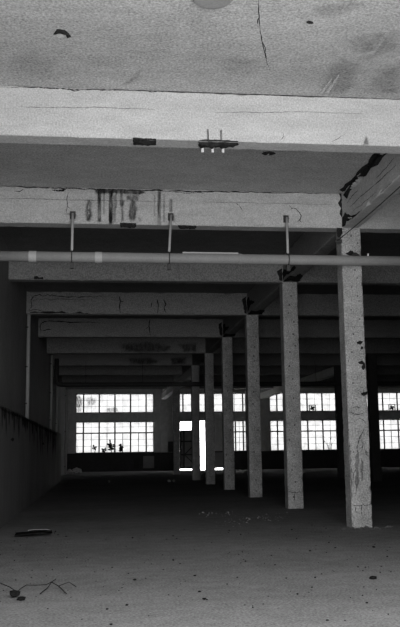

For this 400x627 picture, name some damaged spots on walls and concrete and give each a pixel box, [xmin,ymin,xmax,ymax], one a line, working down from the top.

spalling [53,29,71,39]
crack [257,0,269,67]
water stain [95,189,144,224]
crack [4,186,332,222]
spalling [337,153,388,238]
spalling [277,266,303,282]
spalling [242,297,265,315]